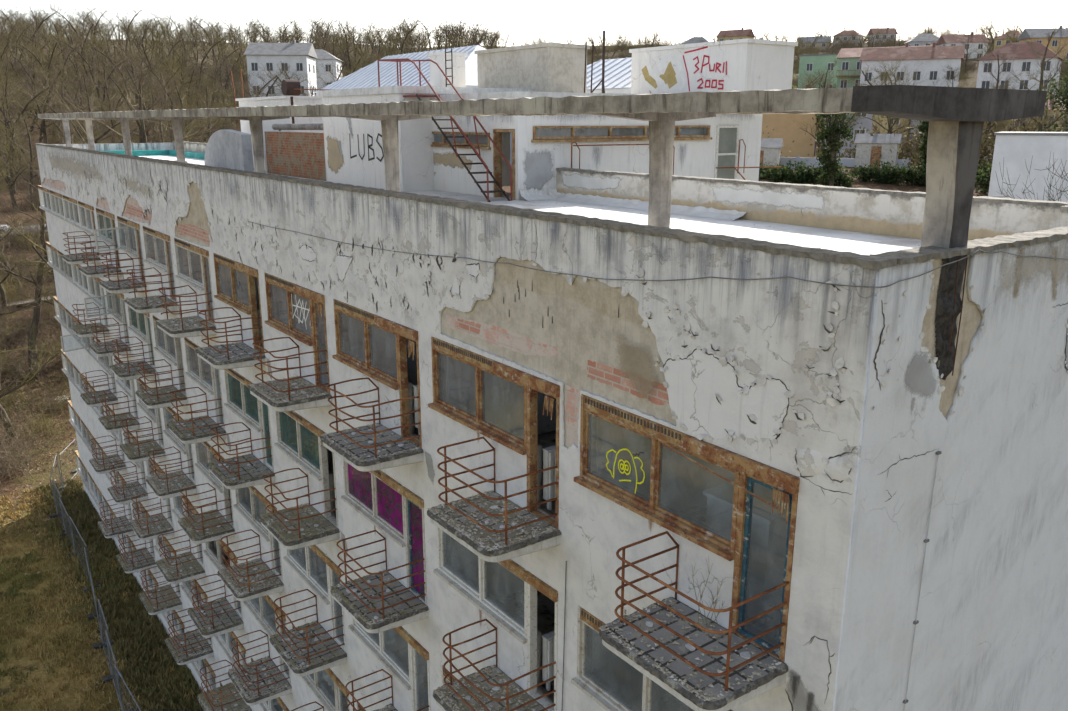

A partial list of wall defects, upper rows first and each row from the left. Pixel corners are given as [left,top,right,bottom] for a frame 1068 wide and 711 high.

flaking render [70,160,168,226]
flaking render [174,182,411,312]
flaking render [412,249,804,448]
peeling [873,303,903,390]
spalling [920,257,968,397]